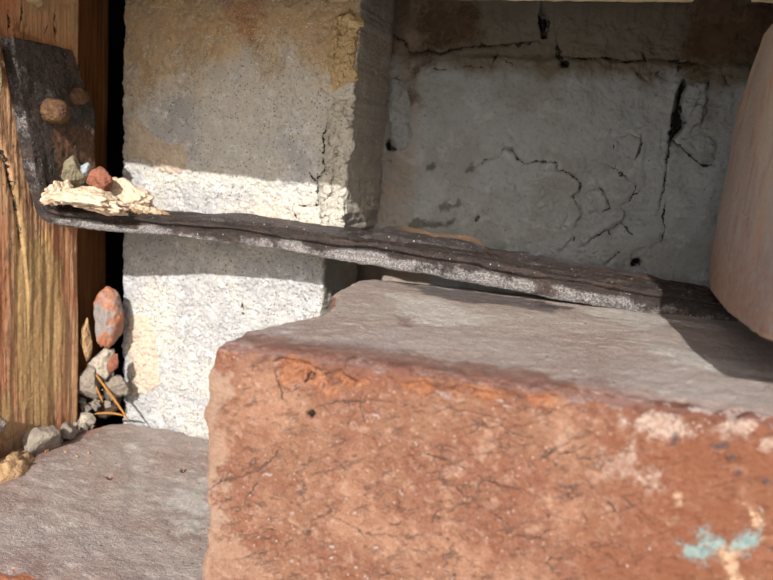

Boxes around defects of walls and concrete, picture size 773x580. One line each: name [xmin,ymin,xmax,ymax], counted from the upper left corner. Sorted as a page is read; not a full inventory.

crack [393,20,697,78]
crack [292,124,327,218]
corrosion [177,213,486,252]
crack [510,145,638,261]
crack [659,122,712,241]